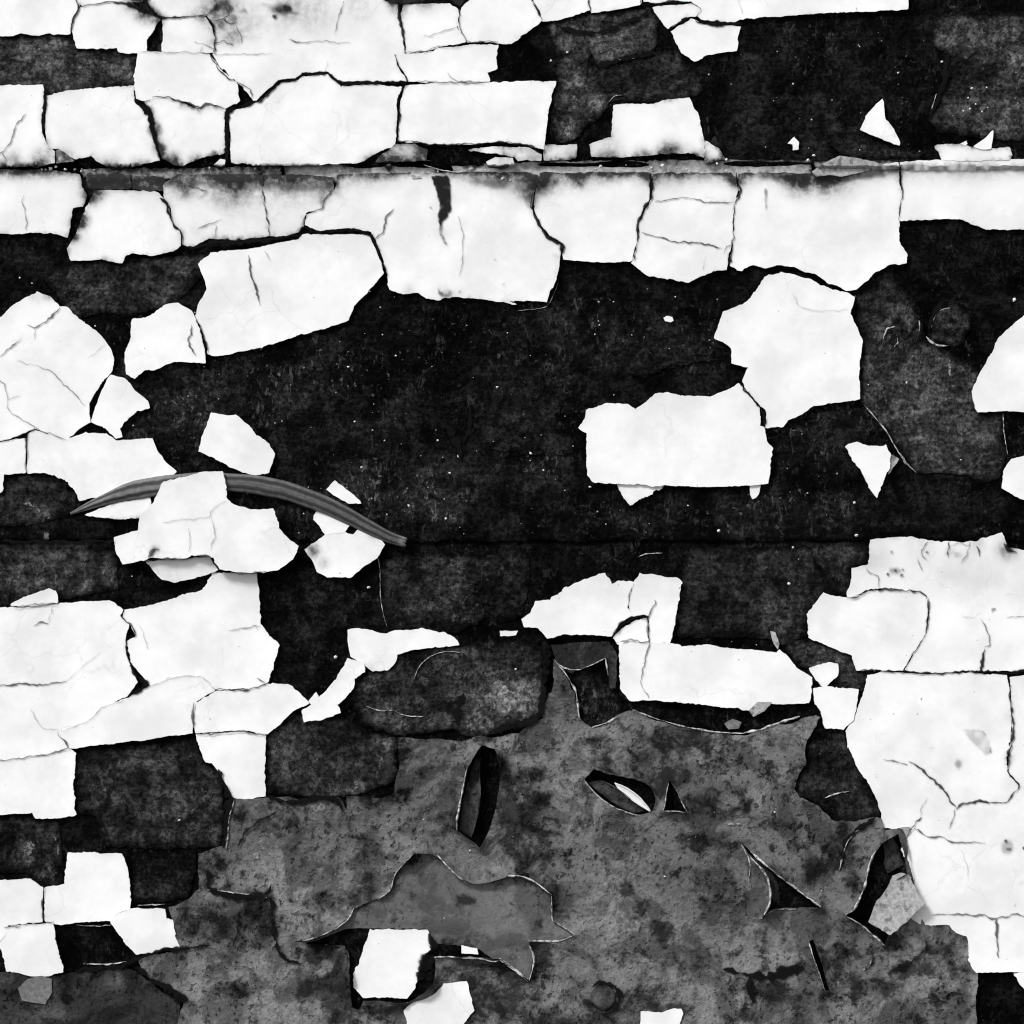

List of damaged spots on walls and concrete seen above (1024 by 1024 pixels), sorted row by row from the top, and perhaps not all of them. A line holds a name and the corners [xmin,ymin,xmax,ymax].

crack [0,88,57,162]
crack [70,1,541,303]
peeling [0,0,1024,526]
crack [530,191,565,255]
crack [633,172,742,264]
crack [0,381,63,473]
crack [120,610,149,697]
crack [191,704,265,736]
peeling [0,471,1024,1004]
crack [851,570,1024,843]
peeling [353,929,474,1024]
peeling [640,1008,683,1024]